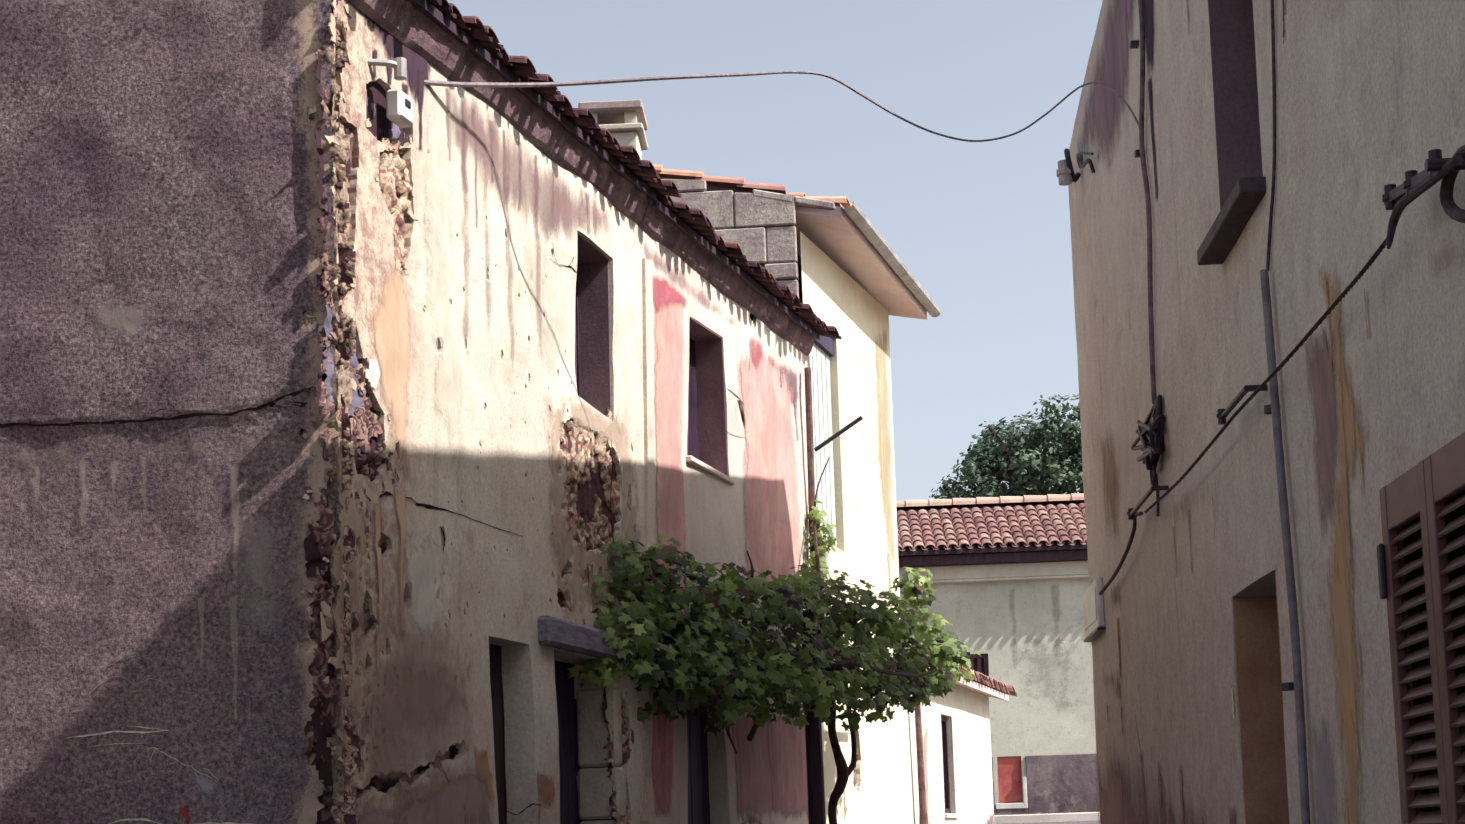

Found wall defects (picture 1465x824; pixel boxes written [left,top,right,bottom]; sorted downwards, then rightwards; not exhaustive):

leakage [365,15,431,150]
leakage [1082,0,1157,198]
leakage [447,87,601,330]
crack [0,386,322,428]
spalling [293,0,493,824]
crack [380,491,521,551]
spalling [549,405,638,620]
peeling [653,277,687,648]
rust [1305,271,1363,824]